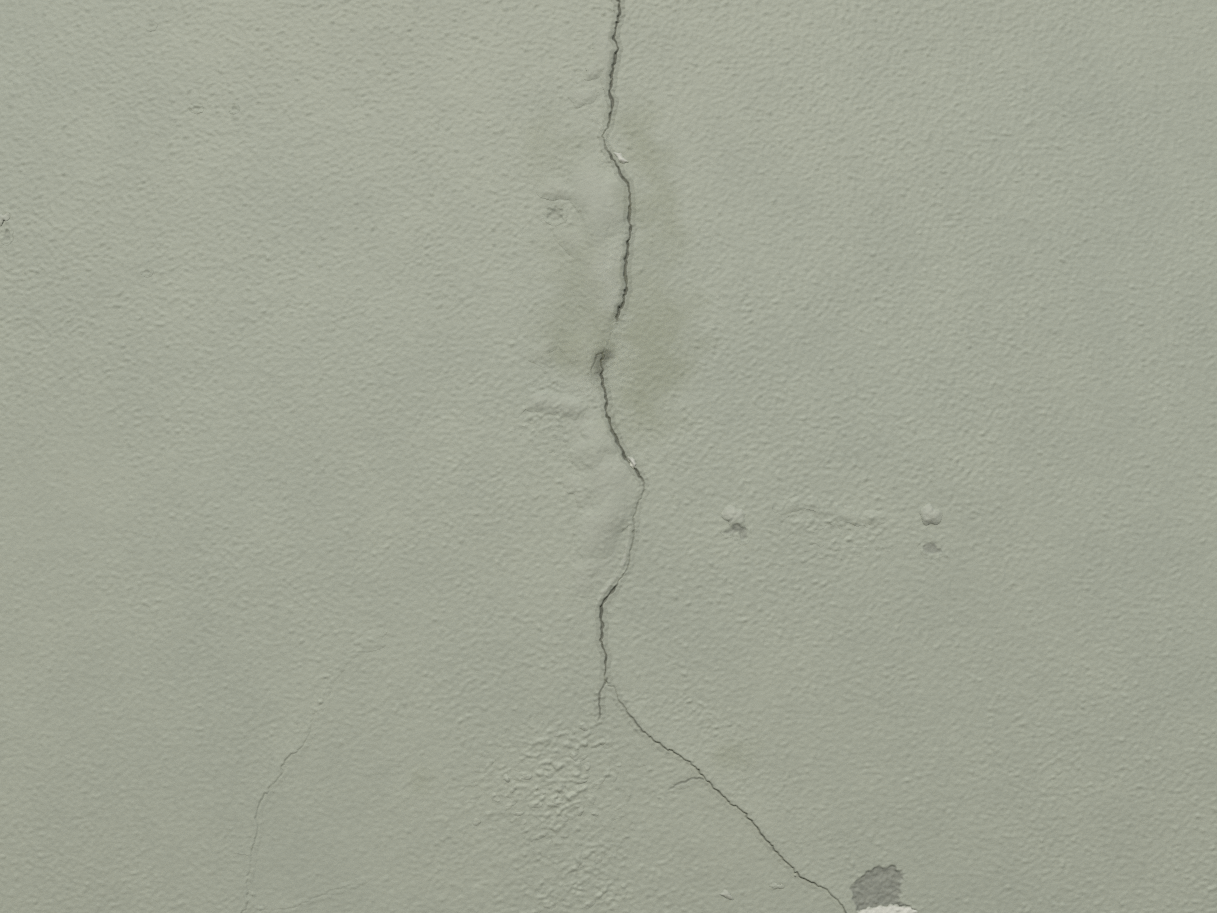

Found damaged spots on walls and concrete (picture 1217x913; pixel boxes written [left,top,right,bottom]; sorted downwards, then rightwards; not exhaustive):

crack [587,0,881,913]
spalling [846,861,919,913]